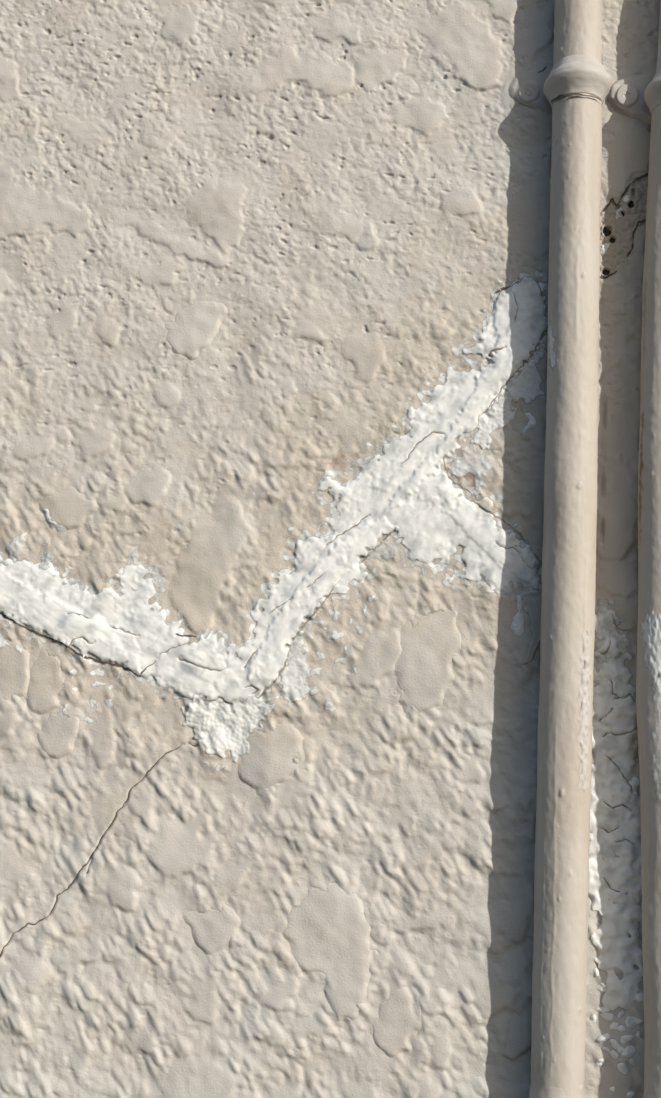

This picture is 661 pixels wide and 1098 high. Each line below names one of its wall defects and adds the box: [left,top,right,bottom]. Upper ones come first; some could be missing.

peeling [600,173,648,279]
crack [494,281,543,322]
crack [484,325,548,413]
crack [325,515,395,564]
crack [402,431,540,567]
crack [0,574,339,705]
crack [0,739,199,957]